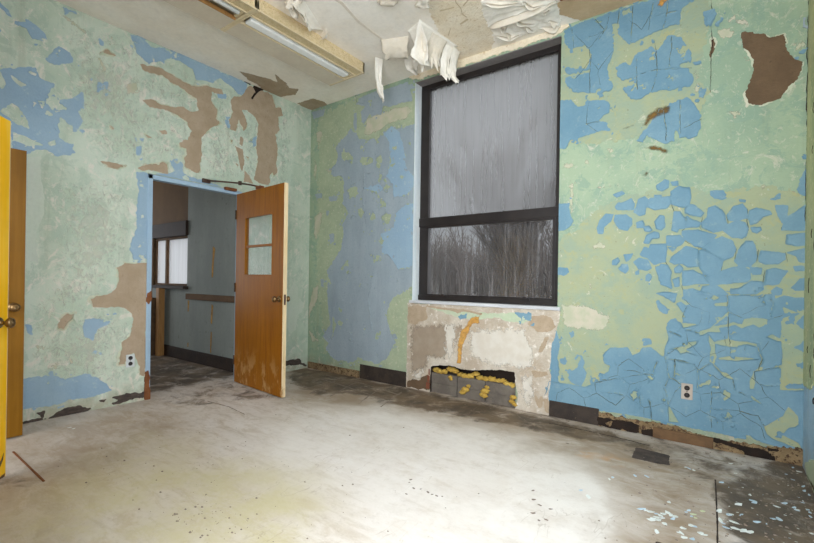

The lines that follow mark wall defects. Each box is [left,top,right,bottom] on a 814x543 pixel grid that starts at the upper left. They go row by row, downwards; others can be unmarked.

peeling [0,3,47,46]
peeling [45,46,79,66]
crack [572,2,681,90]
peeling [0,64,85,263]
spalling [83,34,299,377]
peeling [285,0,814,519]
crack [556,209,784,438]
crack [549,423,649,446]